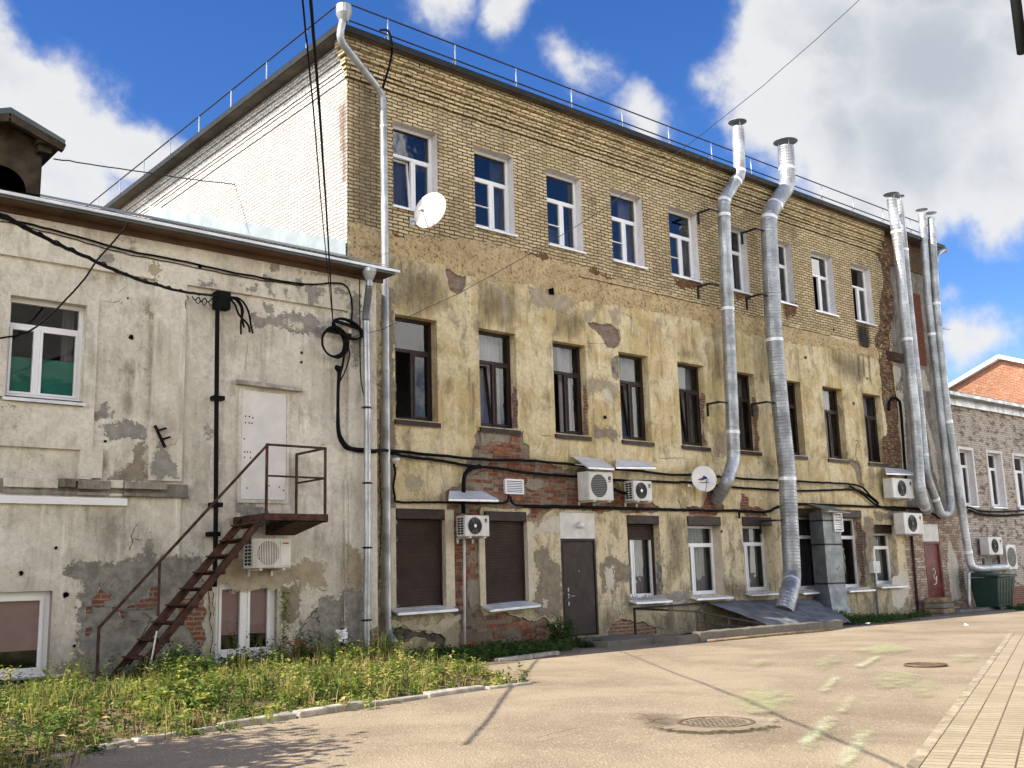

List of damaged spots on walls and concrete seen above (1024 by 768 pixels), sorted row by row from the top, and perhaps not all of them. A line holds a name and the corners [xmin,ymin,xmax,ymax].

peeling [240,263,363,368]
flaking render [348,221,765,442]
flaking render [782,237,907,492]
peeling [94,401,179,482]
flaking render [370,287,659,654]
flaking render [85,585,158,619]
flaking render [179,597,207,647]